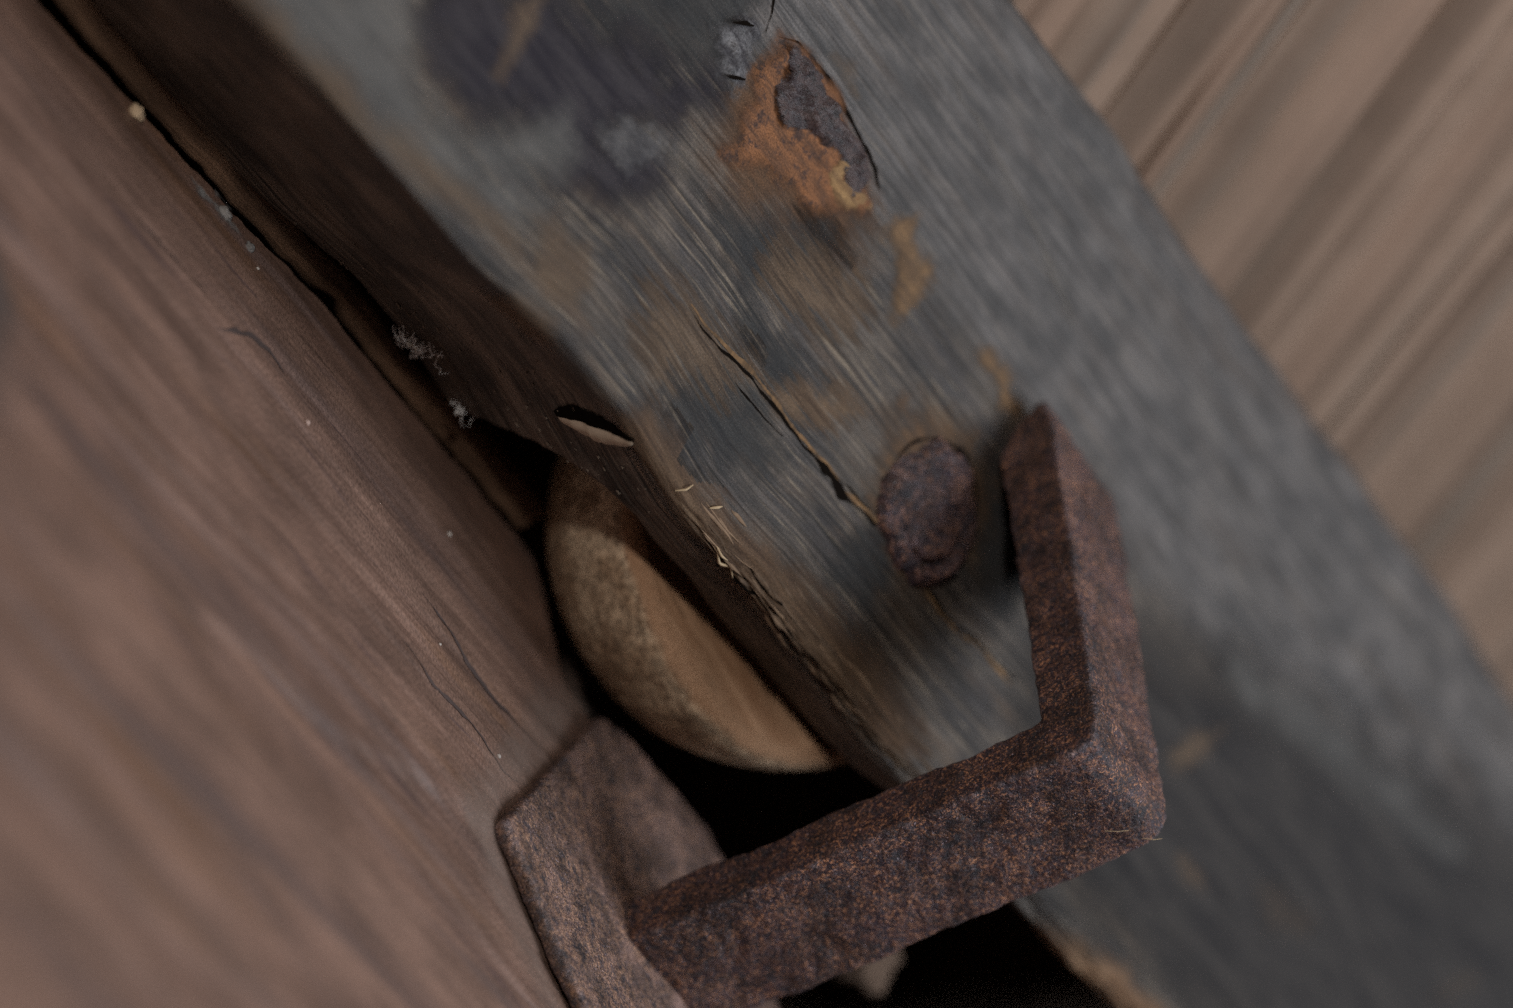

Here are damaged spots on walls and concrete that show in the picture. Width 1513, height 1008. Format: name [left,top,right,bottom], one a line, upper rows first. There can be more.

corrosion [719,34,880,284]
crack [690,304,878,527]